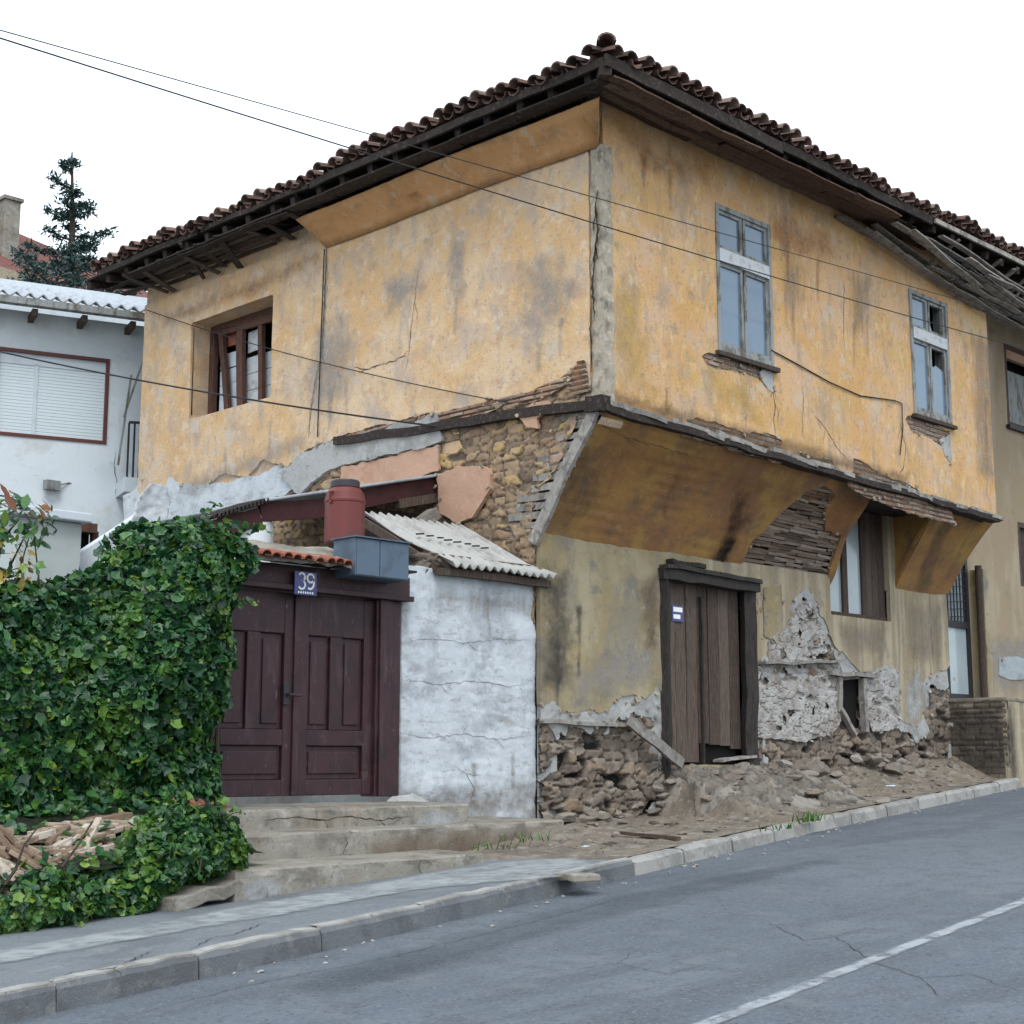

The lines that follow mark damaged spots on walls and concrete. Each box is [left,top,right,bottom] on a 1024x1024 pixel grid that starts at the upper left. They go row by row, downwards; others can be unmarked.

crack [354,276,418,373]
crack [589,190,600,373]
peeling [702,353,777,393]
peeling [166,360,592,525]
peeling [906,415,952,465]
peeling [123,479,143,521]
spalling [416,533,489,549]
peeling [743,486,840,575]
leakage [545,581,581,686]
peeling [758,585,955,764]
crack [400,722,528,748]
peeling [539,687,662,771]